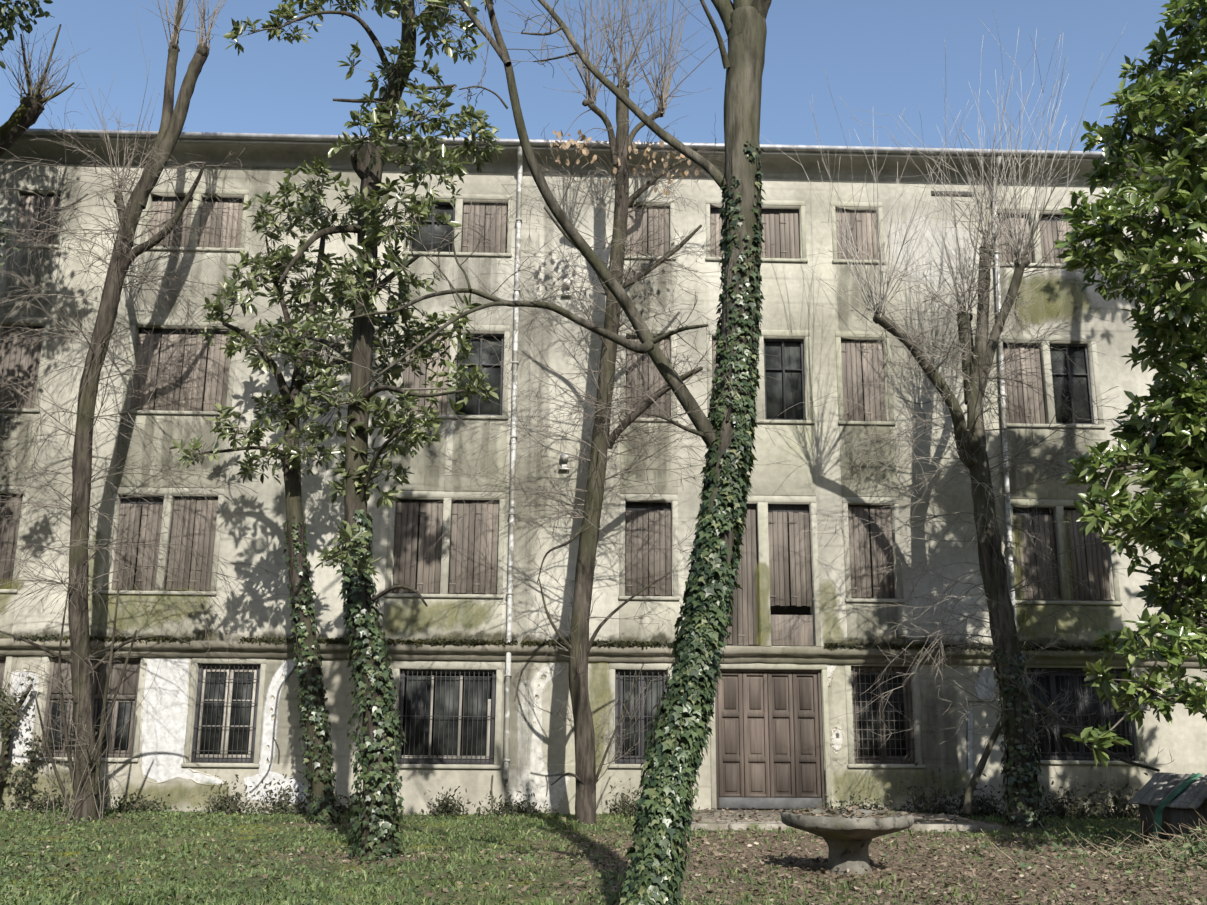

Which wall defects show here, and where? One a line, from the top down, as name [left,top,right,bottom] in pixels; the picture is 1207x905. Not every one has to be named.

flaking render [8,668,44,767]
flaking render [140,657,229,786]
flaking render [244,658,308,802]
flaking render [506,661,570,809]